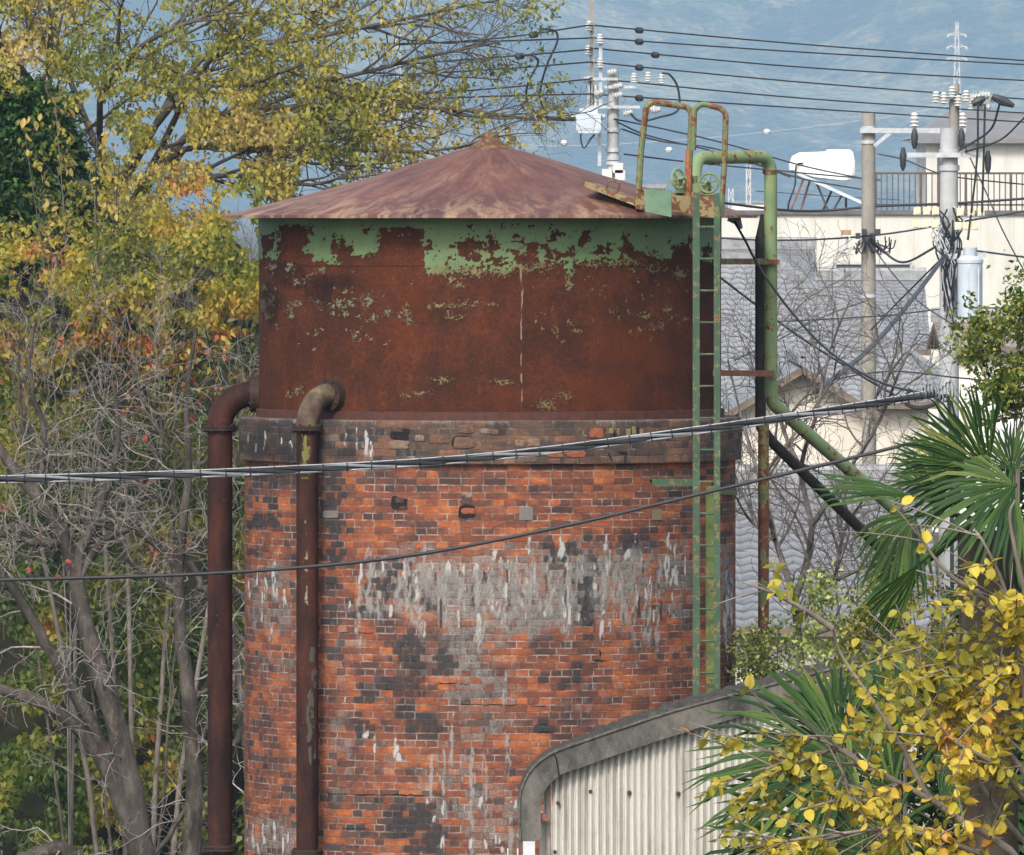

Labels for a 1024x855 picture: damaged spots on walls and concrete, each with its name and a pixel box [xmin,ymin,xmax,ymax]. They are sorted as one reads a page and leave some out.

peeling [258,218,722,345]
leakage [349,533,686,688]
corrosion [306,646,318,773]
efflorescence [426,712,454,822]
efflorescence [469,748,519,853]